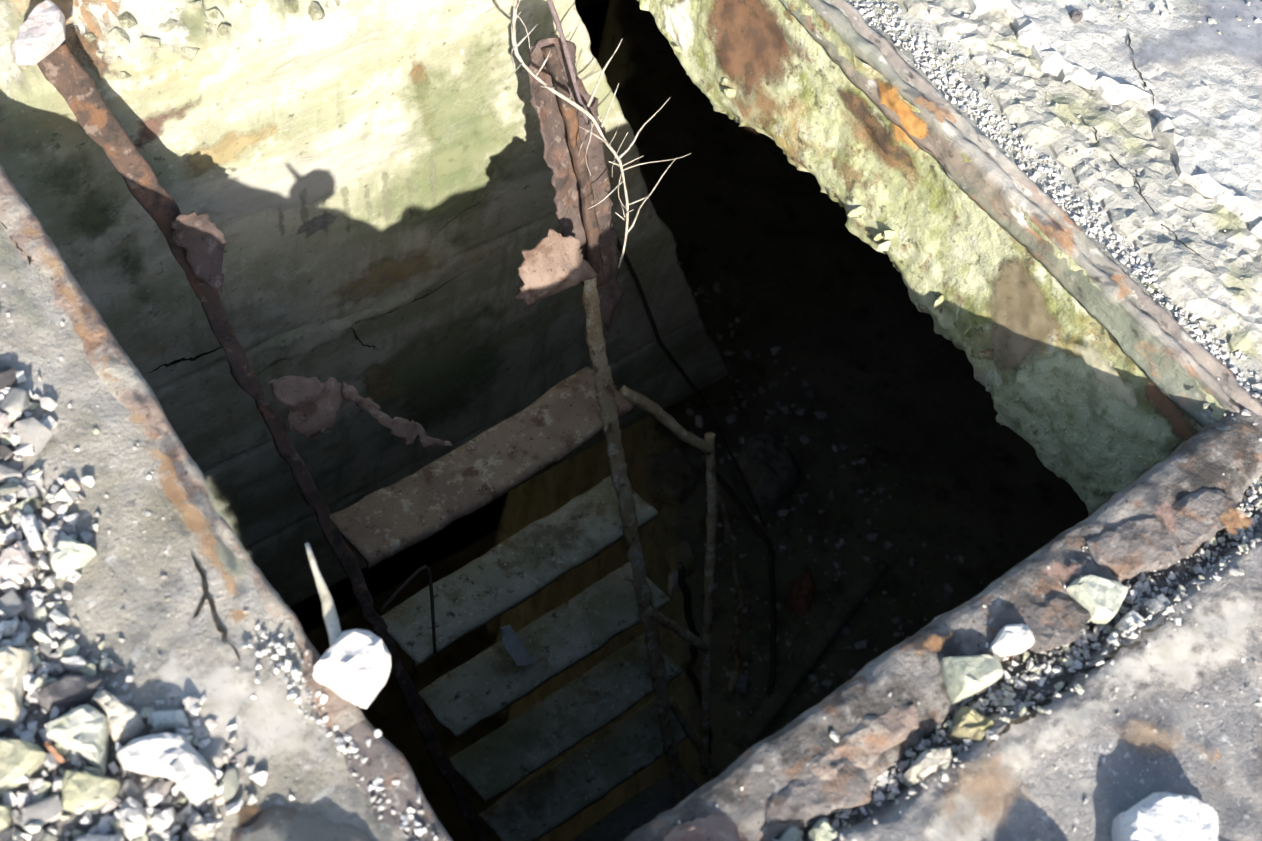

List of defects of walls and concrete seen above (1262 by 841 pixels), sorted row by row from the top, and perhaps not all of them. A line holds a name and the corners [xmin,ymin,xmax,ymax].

corrosion [136,107,187,147]
corrosion [410,64,428,95]
corrosion [839,82,956,176]
crack [1127,29,1154,106]
crack [1073,112,1220,274]
corrosion [24,228,88,338]
corrosion [152,450,236,594]
crack [191,552,240,661]